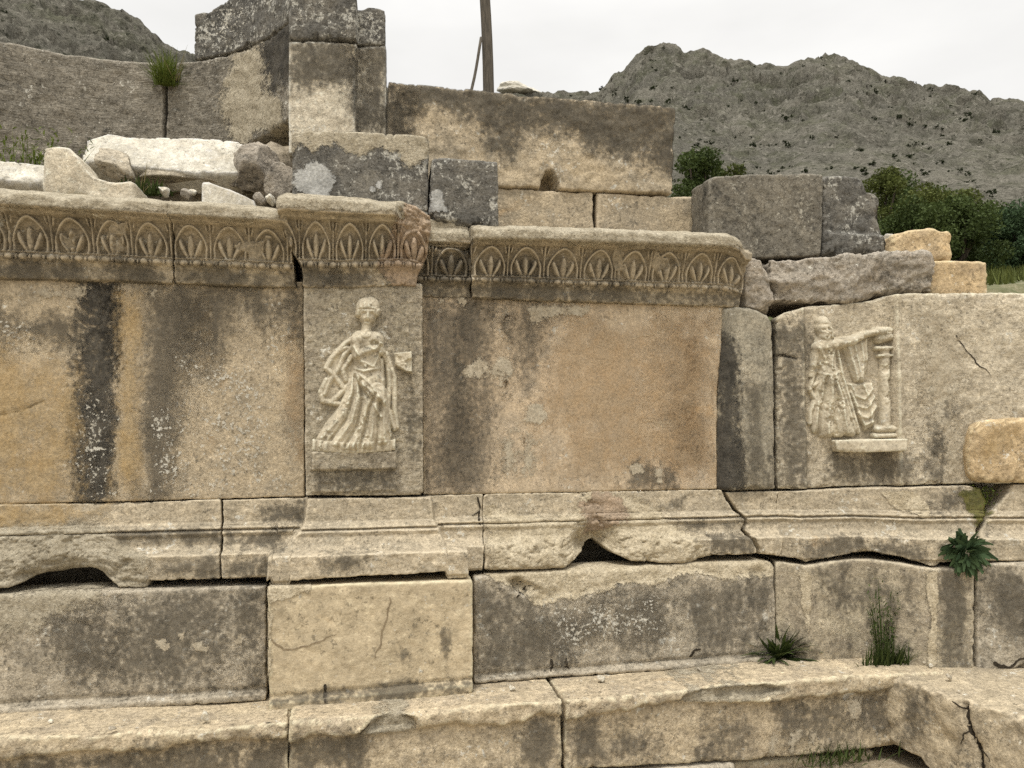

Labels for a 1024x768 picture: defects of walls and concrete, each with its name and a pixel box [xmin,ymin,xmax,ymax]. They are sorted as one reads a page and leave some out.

damp [64,282,127,503]
damp [139,281,304,501]
crack [956,335,990,374]
spalling [0,517,156,644]
damp [473,575,774,674]
spalling [479,491,774,606]
crack [952,701,990,768]